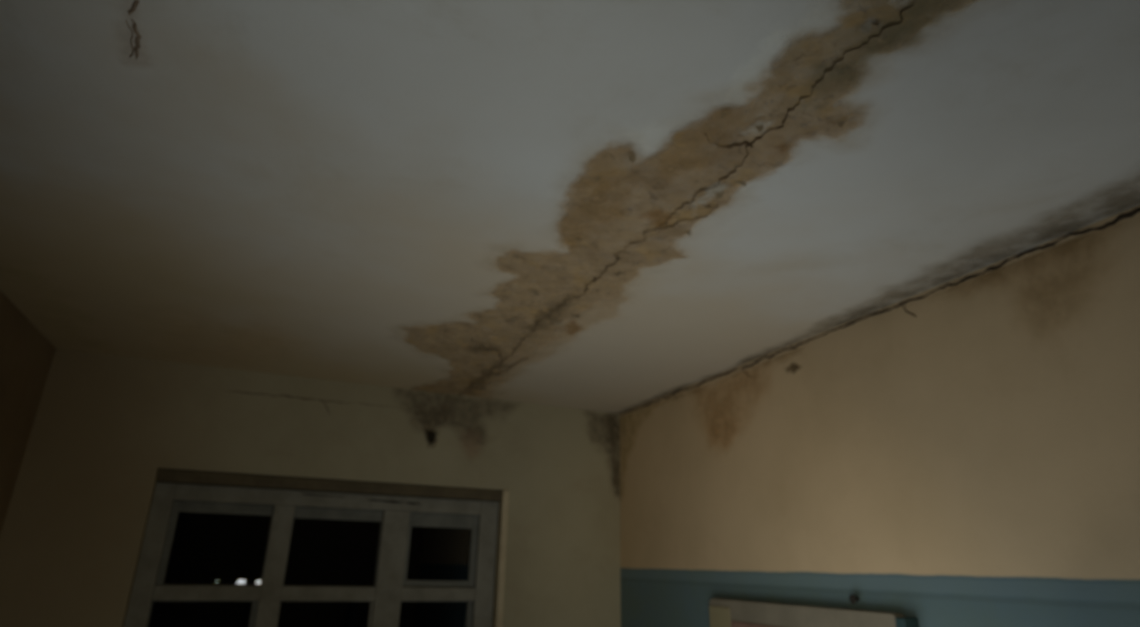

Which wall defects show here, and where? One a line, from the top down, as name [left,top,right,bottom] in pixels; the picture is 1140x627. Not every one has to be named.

crack [126,0,141,60]
damp [407,0,976,440]
crack [621,207,1140,415]